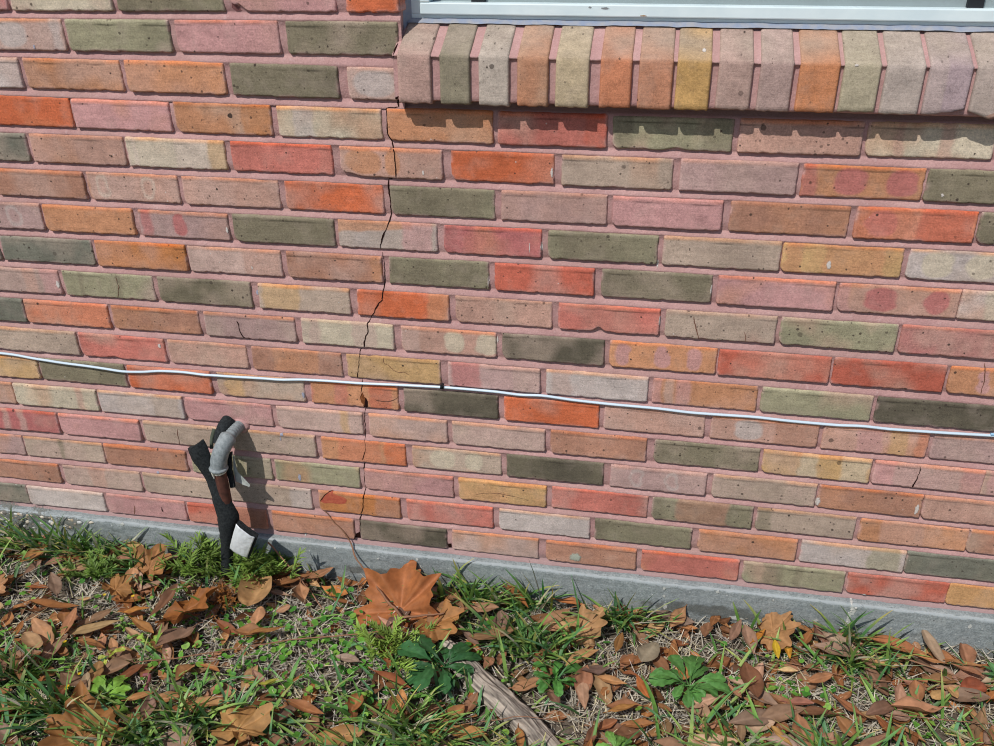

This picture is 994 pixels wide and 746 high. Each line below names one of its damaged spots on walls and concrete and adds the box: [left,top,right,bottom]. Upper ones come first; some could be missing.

crack [357,96,409,526]